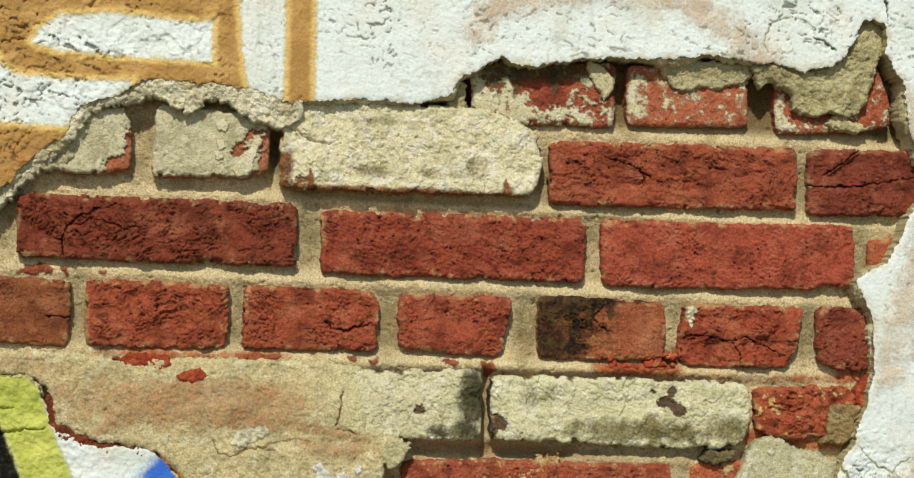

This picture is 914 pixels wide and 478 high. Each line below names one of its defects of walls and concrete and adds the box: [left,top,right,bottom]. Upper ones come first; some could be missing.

peeling [0,55,756,211]
peeling [774,89,845,134]
crack [807,151,914,188]
flaking render [864,20,914,167]
flaking render [847,203,914,395]
flaking render [2,373,160,456]
peeling [347,356,782,471]
peeling [721,461,734,476]
flaking render [793,386,860,464]
crack [841,443,910,478]